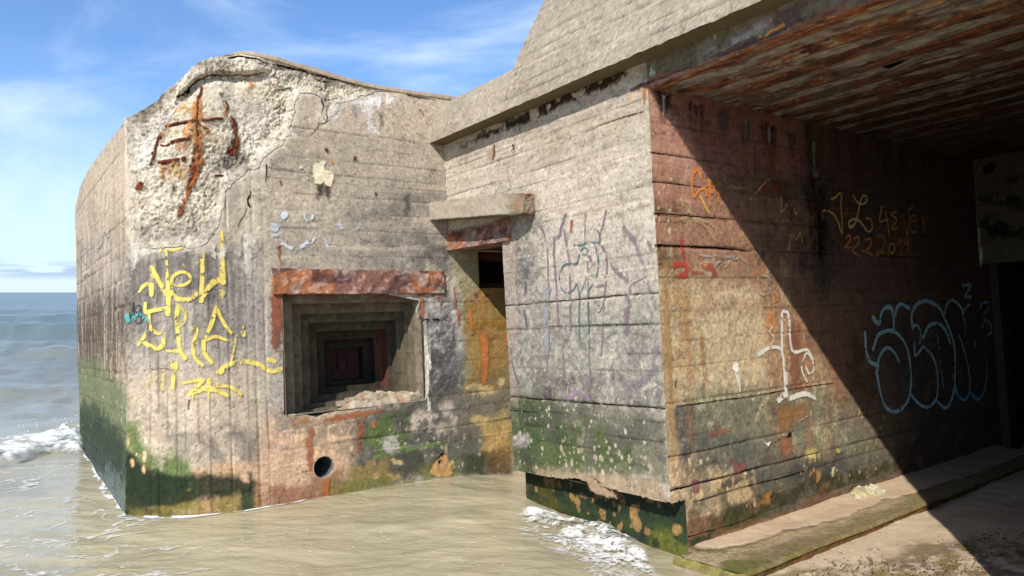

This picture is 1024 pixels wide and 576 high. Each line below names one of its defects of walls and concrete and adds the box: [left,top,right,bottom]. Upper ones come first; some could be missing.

rust [149,86,211,218]
rust [219,92,240,156]
spalling [124,54,381,249]
crack [177,55,377,137]
rust [630,66,695,103]
spalling [585,477,617,498]